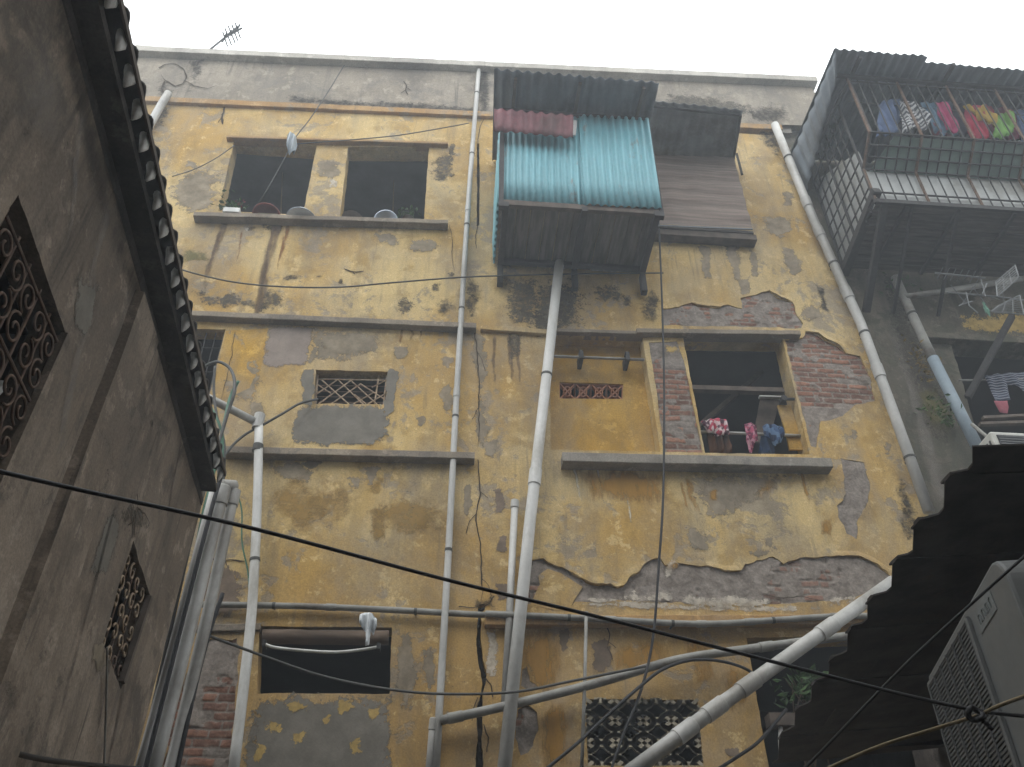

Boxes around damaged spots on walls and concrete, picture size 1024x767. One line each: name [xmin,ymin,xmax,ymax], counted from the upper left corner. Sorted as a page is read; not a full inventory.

leakage [197,223,283,313]
leakage [492,278,661,376]
flaking render [661,245,875,447]
peeling [762,191,802,275]
crack [459,333,495,767]
flaking render [528,458,891,613]
flaking render [163,639,240,767]